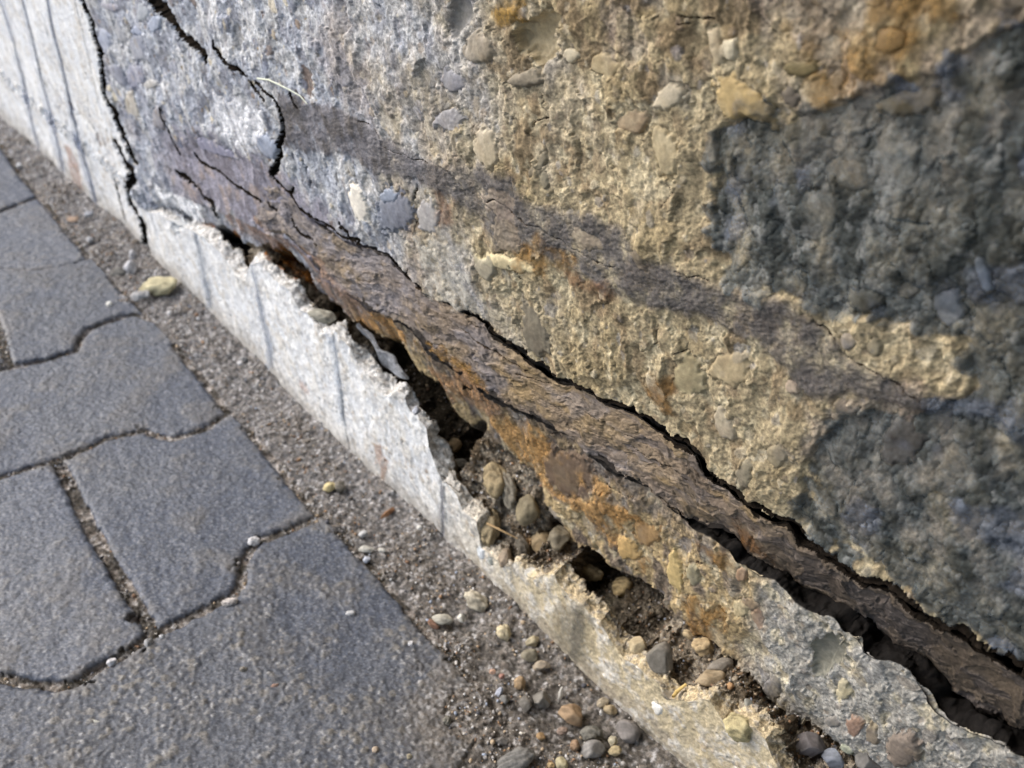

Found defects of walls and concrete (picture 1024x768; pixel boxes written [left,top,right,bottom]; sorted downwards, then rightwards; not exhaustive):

crack [80,0,151,253]
spalling [129,35,148,61]
crack [146,0,362,246]
spalling [473,122,500,172]
spalling [711,70,783,130]
rust [264,245,313,284]
rust [357,312,406,341]
rust [490,418,640,545]
spalling [184,180,1024,768]
rust [647,379,674,412]
crack [389,188,1024,678]
water stain [699,21,1024,661]